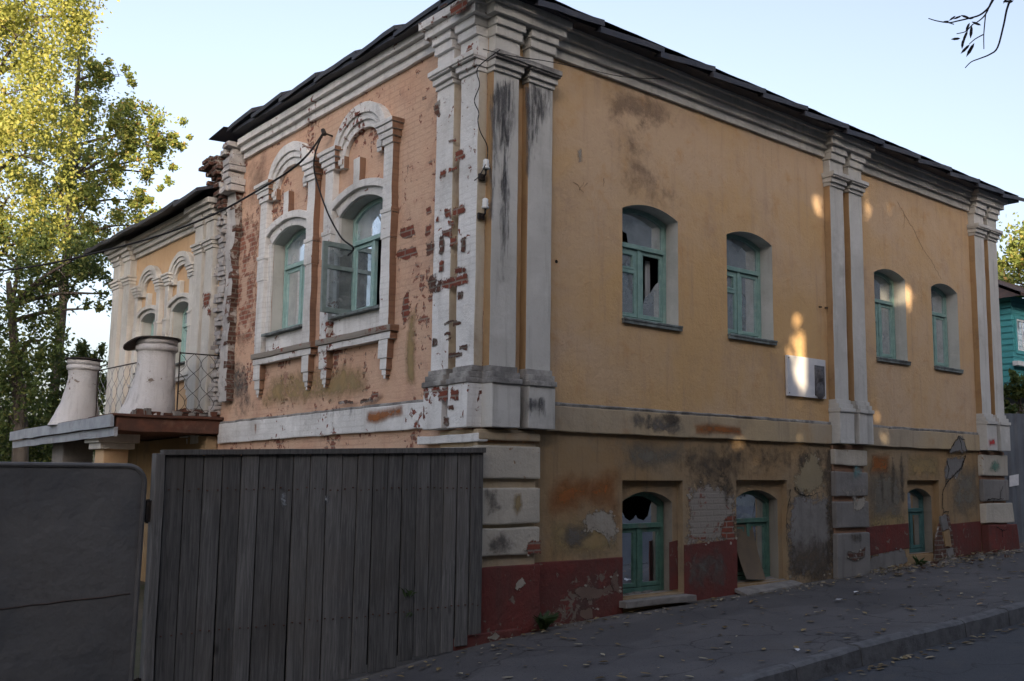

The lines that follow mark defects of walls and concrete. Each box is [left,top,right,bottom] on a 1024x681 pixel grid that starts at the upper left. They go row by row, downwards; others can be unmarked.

spalling [439,138,465,179]
damp [489,82,514,243]
damp [525,85,549,175]
flaking render [236,213,259,352]
flaking render [401,290,412,329]
spalling [395,204,468,300]
spalling [432,320,468,358]
spalling [437,388,459,426]
damp [634,414,680,433]
flaking render [685,481,737,545]
damp [789,451,834,581]
crack [942,436,967,515]